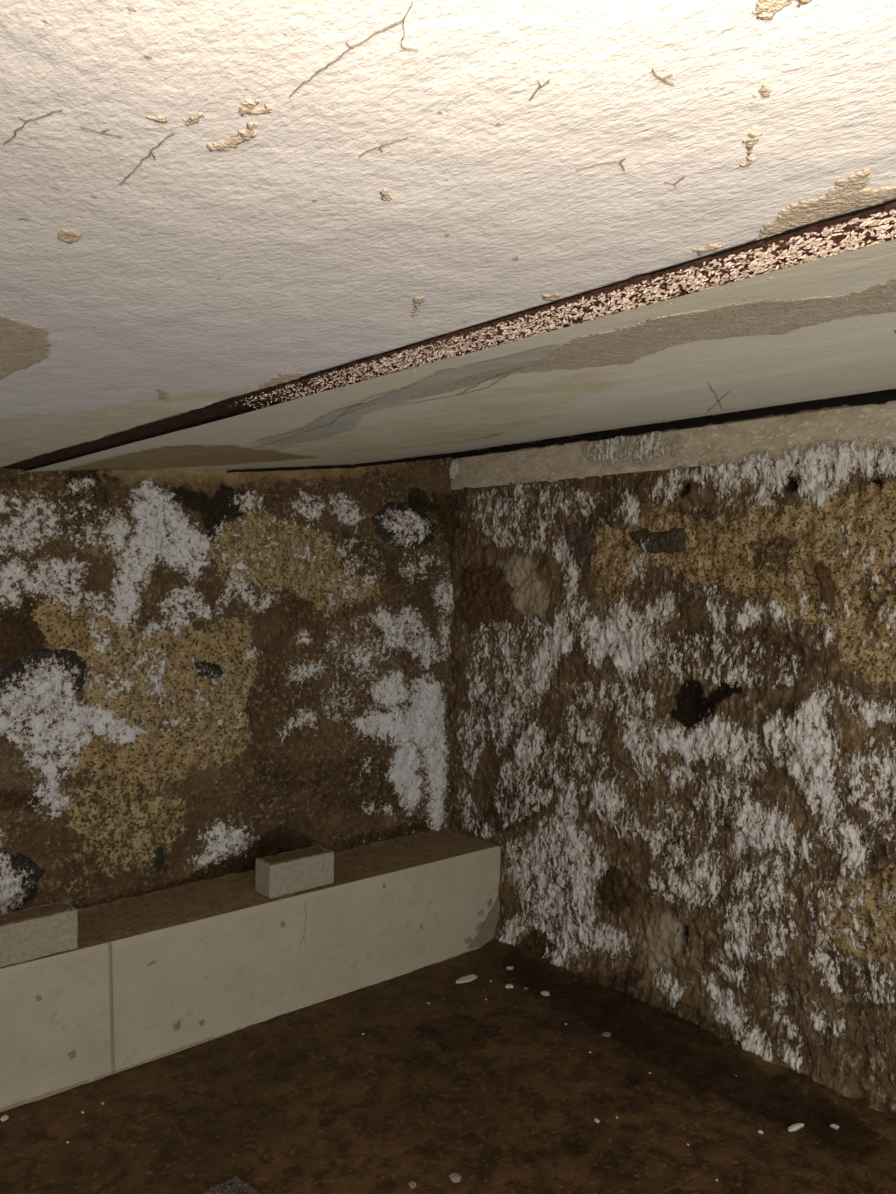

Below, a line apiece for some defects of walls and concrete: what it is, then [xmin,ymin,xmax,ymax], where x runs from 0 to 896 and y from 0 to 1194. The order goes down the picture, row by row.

peeling [752,0,812,20]
crack [289,1,419,98]
crack [3,109,124,146]
crack [120,133,174,185]
peeling [747,168,896,243]
peeling [692,243,726,256]
peeling [0,315,53,380]
rust [3,202,896,470]
peeling [390,278,896,399]
damp [0,346,896,1096]